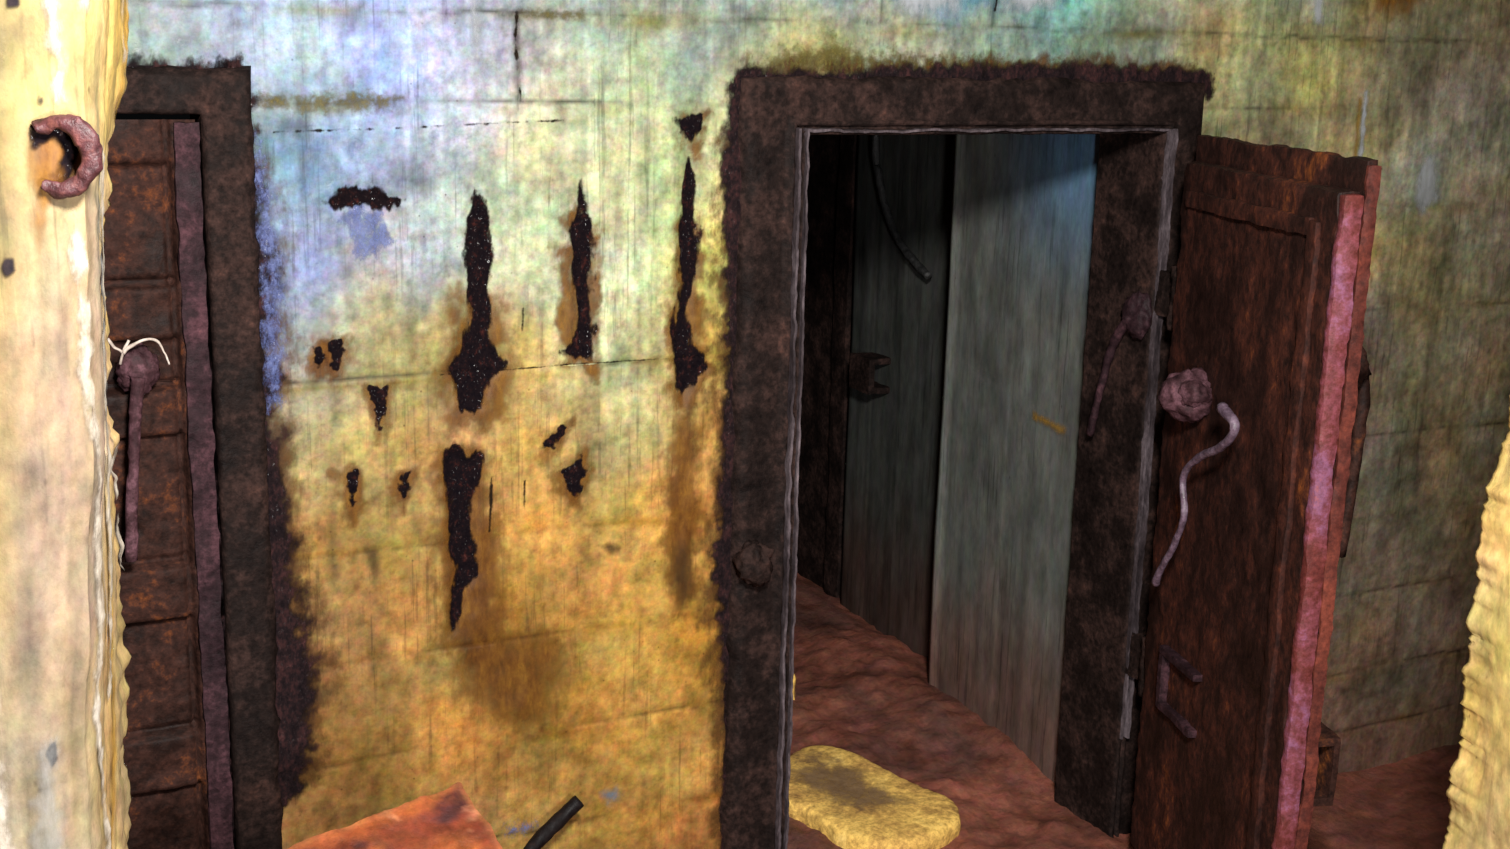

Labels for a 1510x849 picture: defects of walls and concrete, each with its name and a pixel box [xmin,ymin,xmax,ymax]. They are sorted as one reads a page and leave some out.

corrosion [30,128,79,196]
spalling [328,185,401,257]
spalling [390,469,417,511]
spalling [434,189,510,661]
spalling [556,181,602,379]
spalling [660,109,715,609]